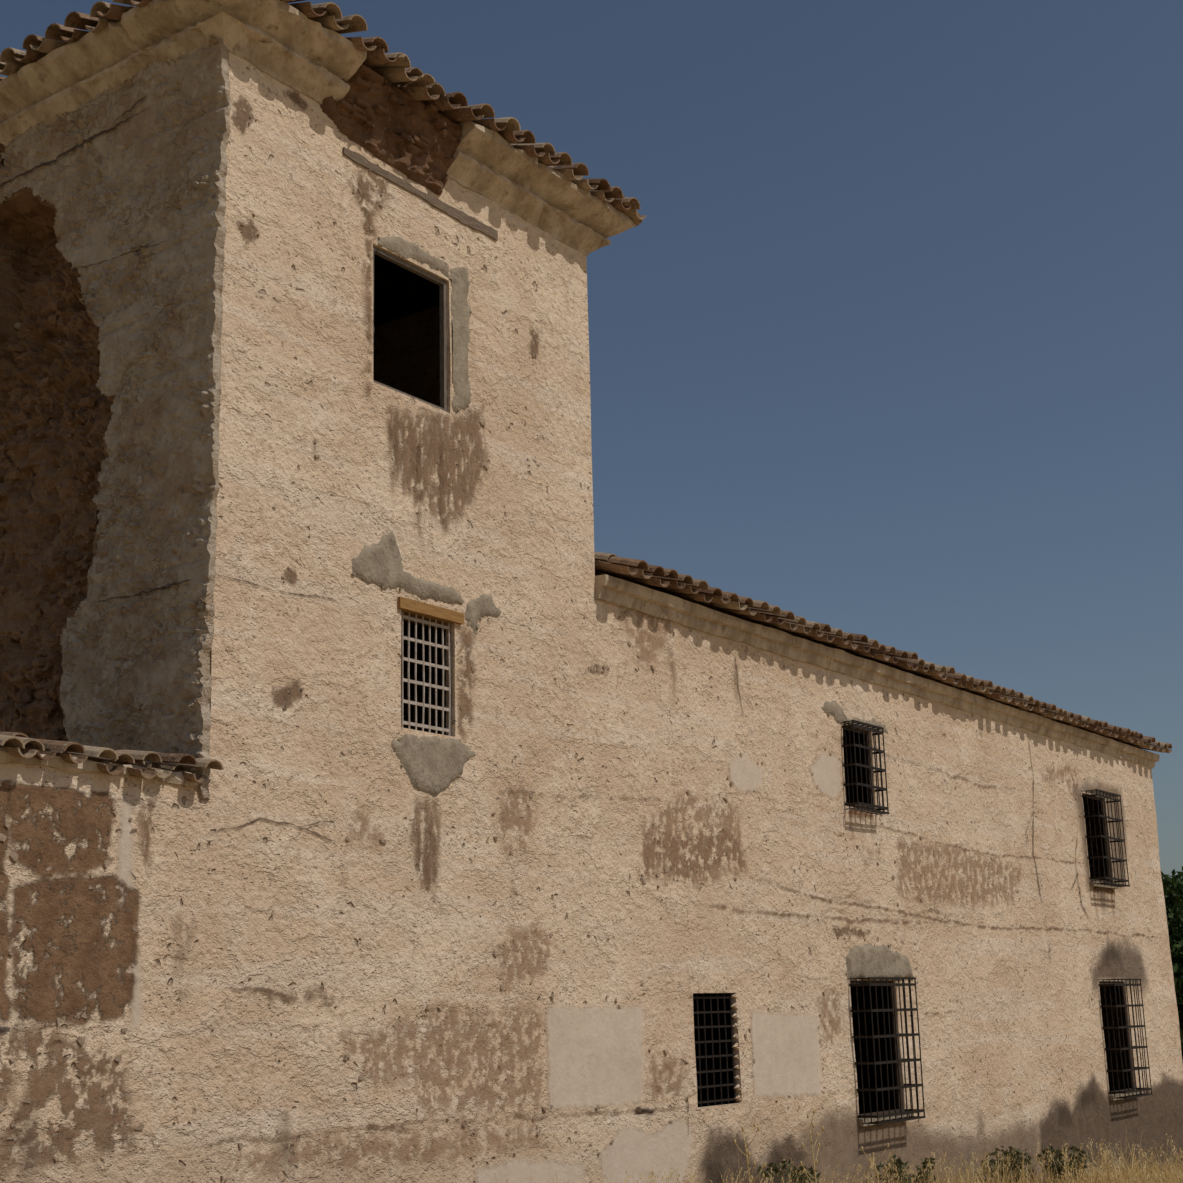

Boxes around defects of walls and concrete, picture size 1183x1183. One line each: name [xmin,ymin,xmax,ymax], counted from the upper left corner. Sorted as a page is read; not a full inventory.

spalling [287,64,462,392]
spalling [0,187,116,752]
flaking render [0,780,144,1169]
crack [218,817,333,841]
flaking render [343,1004,554,1156]
flaking render [640,753,764,888]
crack [717,738,1155,957]
flaking render [891,836,1019,903]